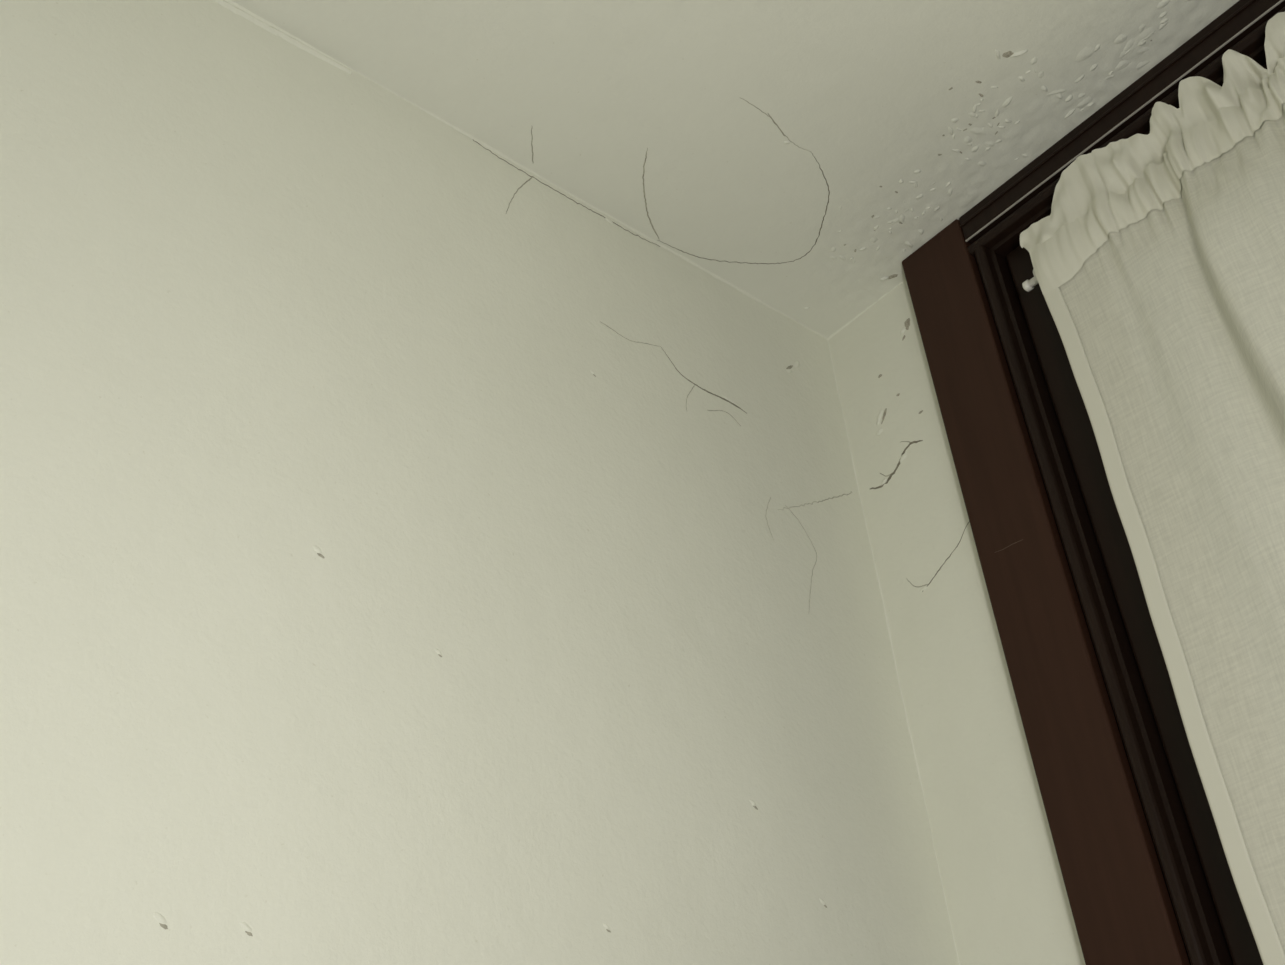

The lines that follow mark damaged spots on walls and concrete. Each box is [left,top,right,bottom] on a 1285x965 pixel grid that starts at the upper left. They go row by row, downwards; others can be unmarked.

crack [473,97,830,264]
crack [766,440,923,608]
crack [909,522,969,592]